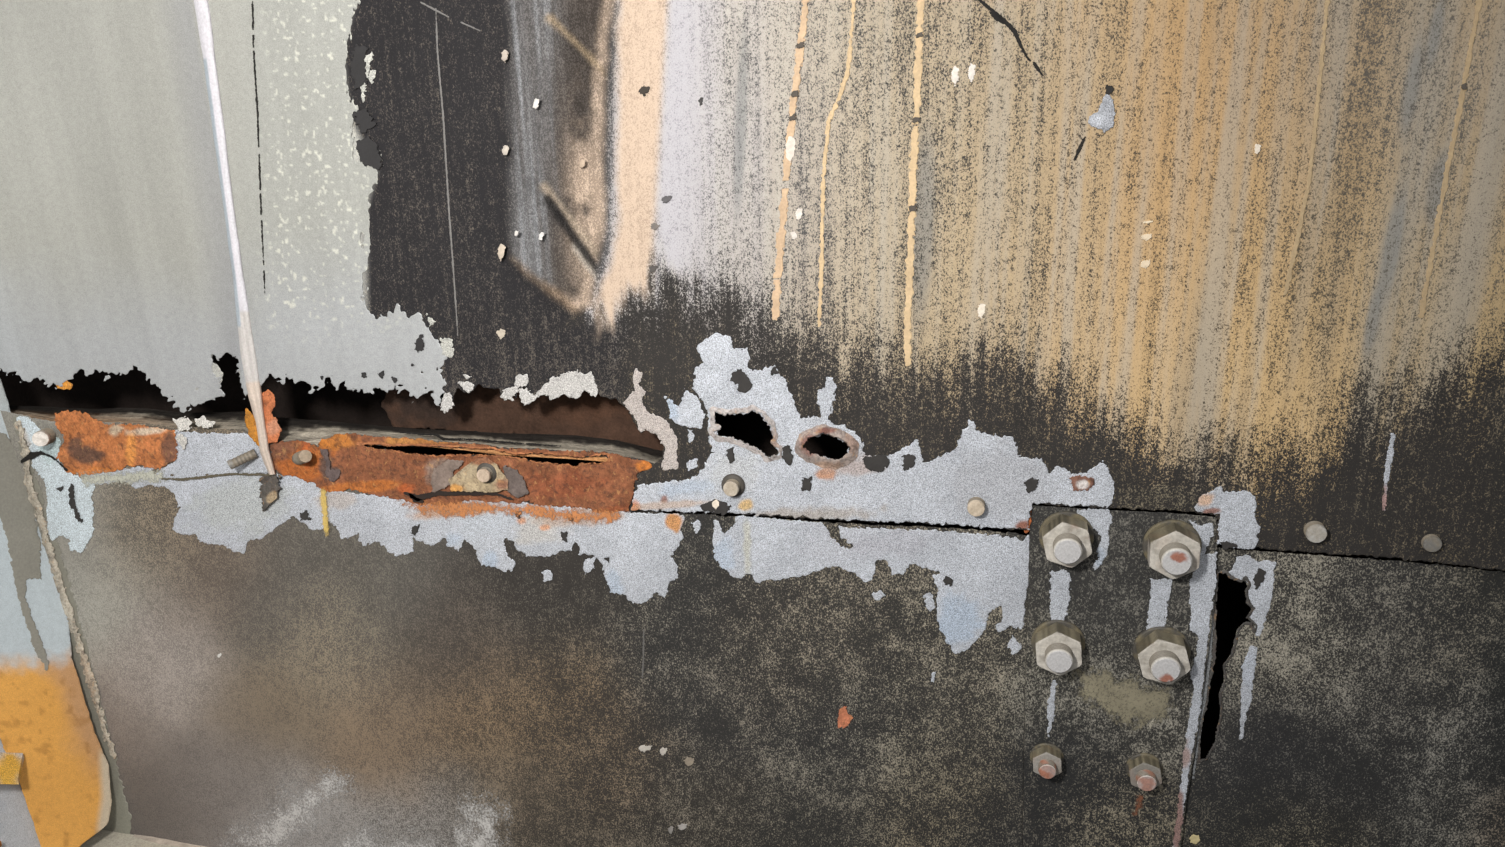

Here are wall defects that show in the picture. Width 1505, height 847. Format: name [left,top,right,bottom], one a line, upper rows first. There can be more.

rust [54,410,178,487]
rust [245,390,652,524]
peeling [0,0,1505,655]
water stain [771,0,809,321]
water stain [817,0,856,327]
water stain [903,0,925,366]
water stain [1283,0,1330,295]
water stain [1418,0,1482,318]
peeling [639,745,667,755]
peeling [1047,680,1057,737]
peeling [1172,520,1277,847]